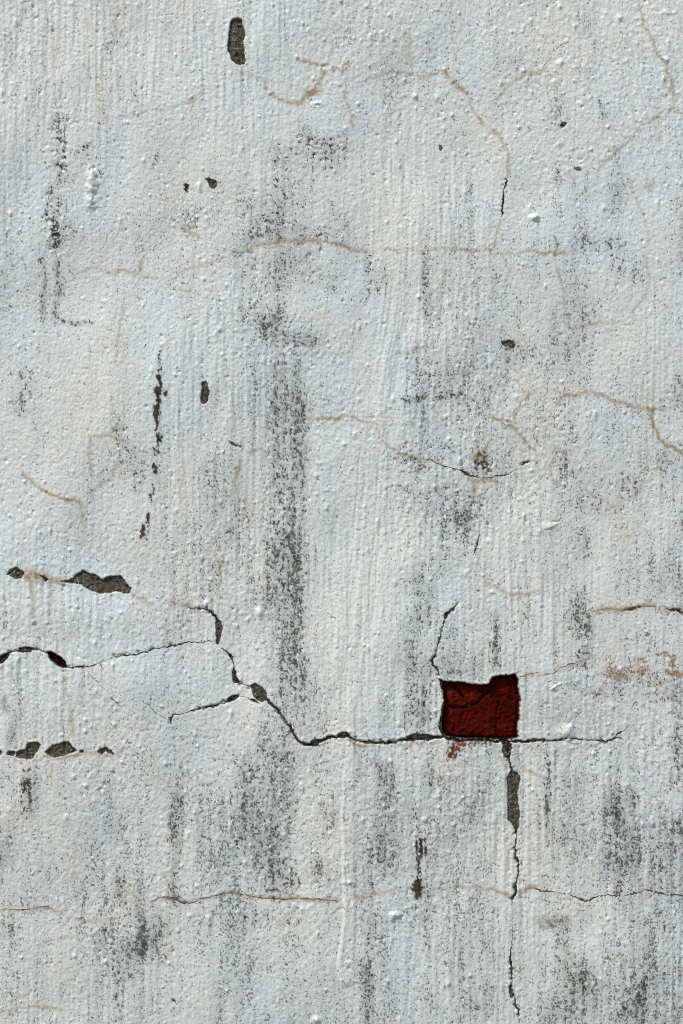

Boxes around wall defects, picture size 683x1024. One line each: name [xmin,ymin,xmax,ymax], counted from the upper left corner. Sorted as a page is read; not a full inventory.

spalling [228,18,246,65]
spalling [201,382,209,404]
spalling [7,567,24,579]
spalling [65,570,131,594]
water stain [196,126,350,1016]
crack [594,605,683,613]
crack [431,592,464,680]
crack [0,607,441,746]
spalling [438,674,520,758]
spalling [0,742,84,759]
crack [149,892,338,904]
crack [505,730,683,1023]